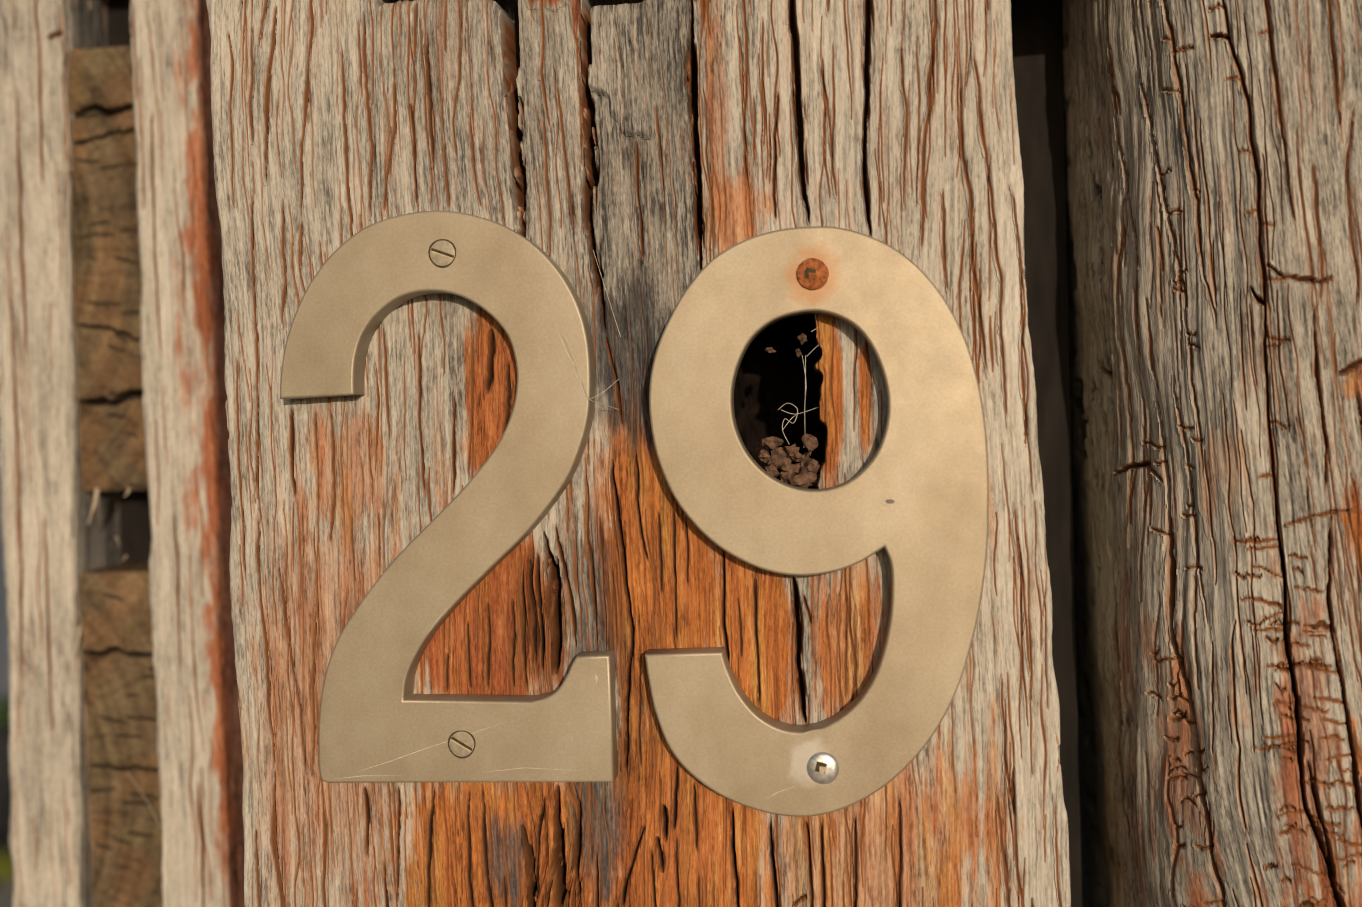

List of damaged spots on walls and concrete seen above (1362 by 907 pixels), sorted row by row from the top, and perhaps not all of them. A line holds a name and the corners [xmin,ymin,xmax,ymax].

crack [225,0,860,907]
rust [779,239,846,307]
crack [740,0,1029,447]
crack [1098,361,1113,380]
crack [1107,0,1362,907]
crack [897,793,905,907]
crack [969,501,1064,907]